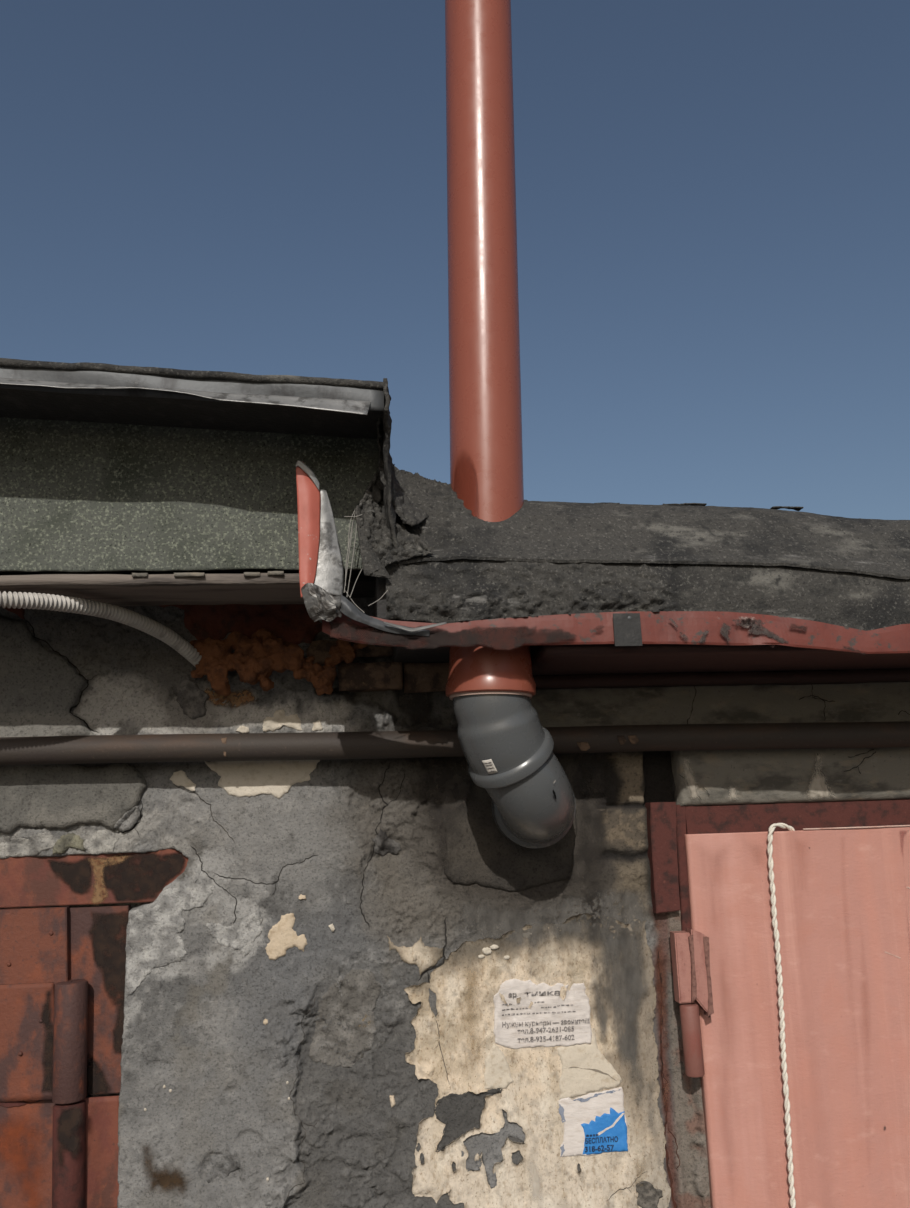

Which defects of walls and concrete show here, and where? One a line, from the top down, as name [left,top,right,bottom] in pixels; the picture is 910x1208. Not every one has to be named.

peeling [5,607,25,619]
peeling [159,604,322,644]
peeling [236,709,323,733]
peeling [170,770,196,791]
peeling [205,760,320,799]
crack [174,784,235,843]
crack [360,764,405,926]
crack [190,845,316,924]
corrosion [49,853,185,1053]
corrosion [87,1057,108,1096]
peeling [387,913,671,1208]
crack [607,951,680,1208]